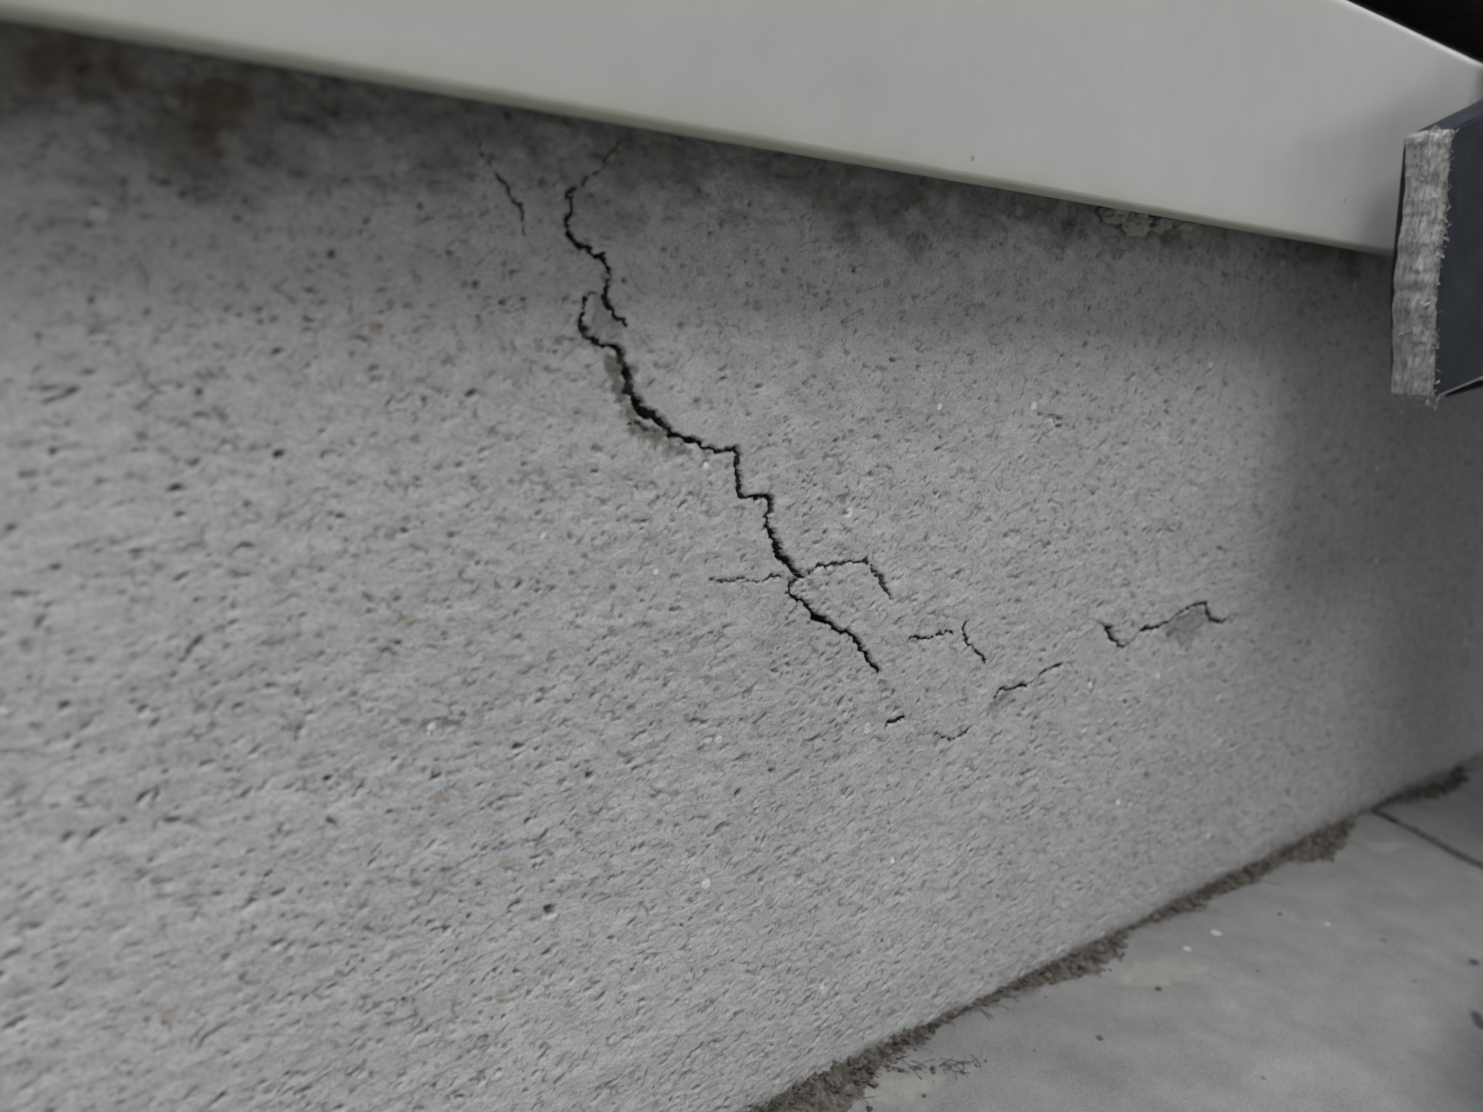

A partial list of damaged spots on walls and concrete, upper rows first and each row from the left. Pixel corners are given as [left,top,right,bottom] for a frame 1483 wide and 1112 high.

crack [473,122,526,236]
crack [563,150,890,675]
crack [909,619,1061,698]
crack [1104,601,1229,650]
crack [886,715,968,741]